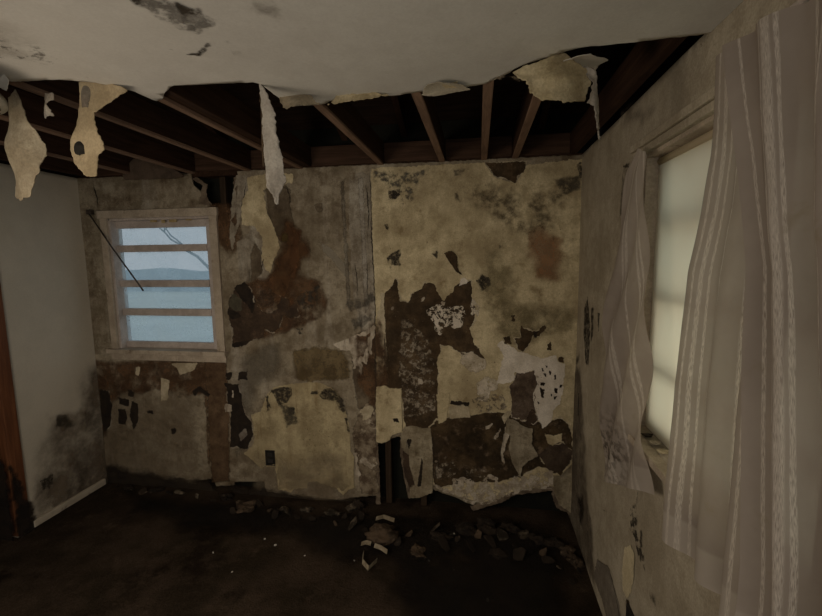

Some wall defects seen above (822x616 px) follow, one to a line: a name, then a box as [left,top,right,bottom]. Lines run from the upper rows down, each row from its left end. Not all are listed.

mould [132,0,211,32]
mould [374,170,424,199]
peeling [486,161,527,183]
damp [552,162,582,201]
flaking render [227,173,300,348]
corrosion [260,221,310,305]
damp [387,250,401,265]
flaking render [333,172,573,515]
peeling [99,390,153,432]
flaking render [224,371,253,450]
damp [0,360,563,616]
peeling [594,544,634,616]